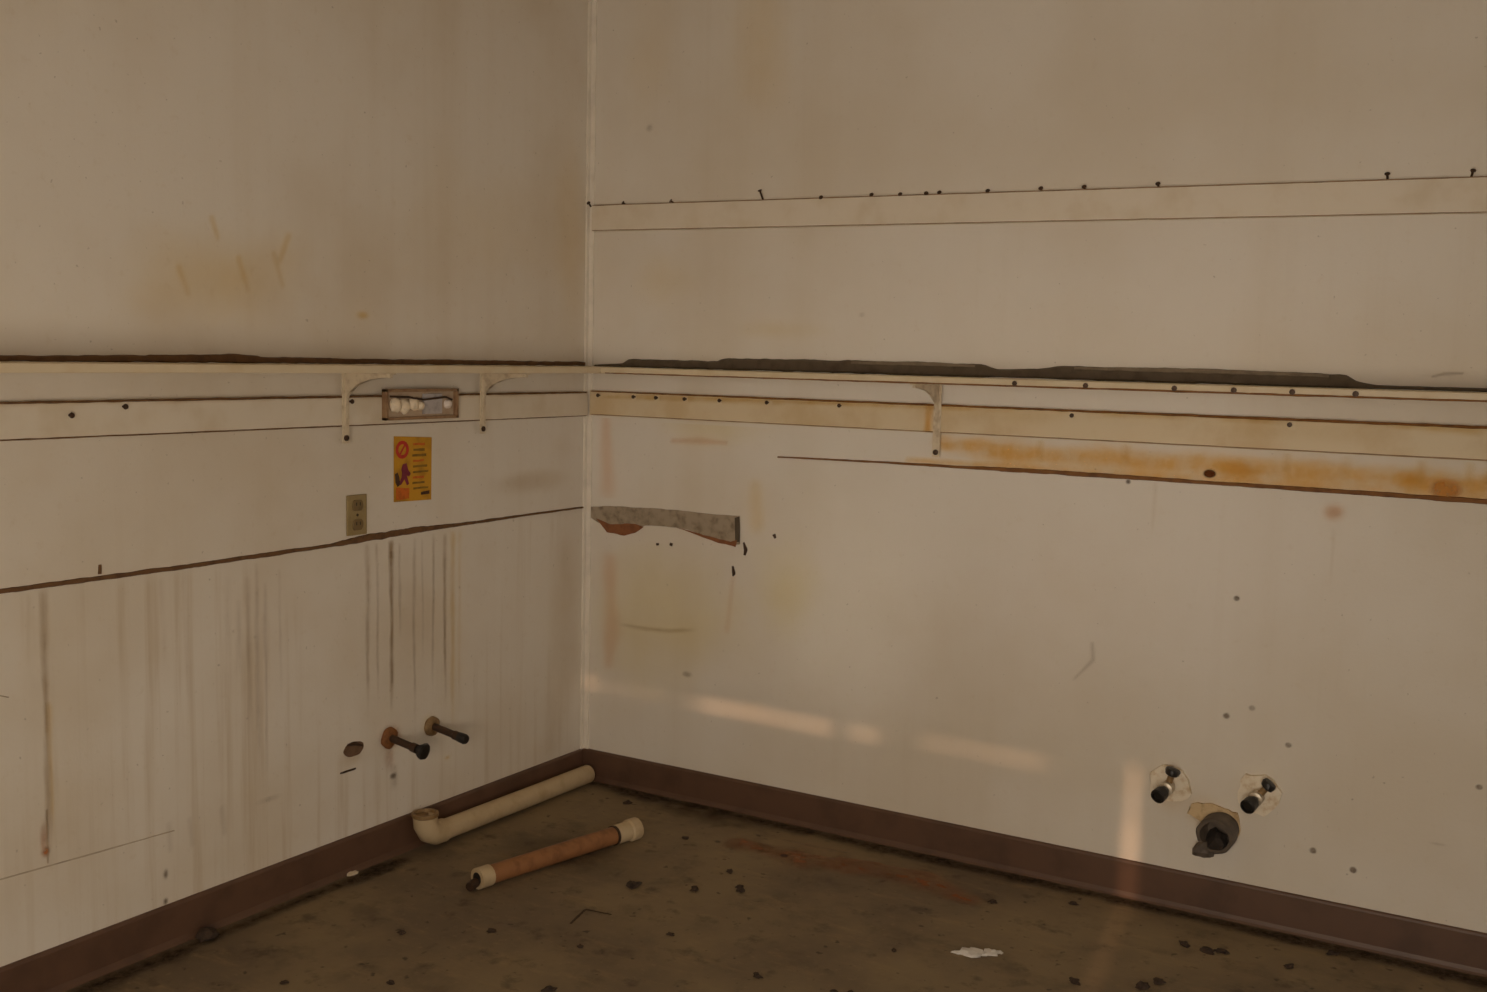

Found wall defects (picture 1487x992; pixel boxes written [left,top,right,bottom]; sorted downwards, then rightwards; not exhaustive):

corrosion [459,391,1487,429]
corrosion [0,414,1487,461]
peeling [591,506,748,576]